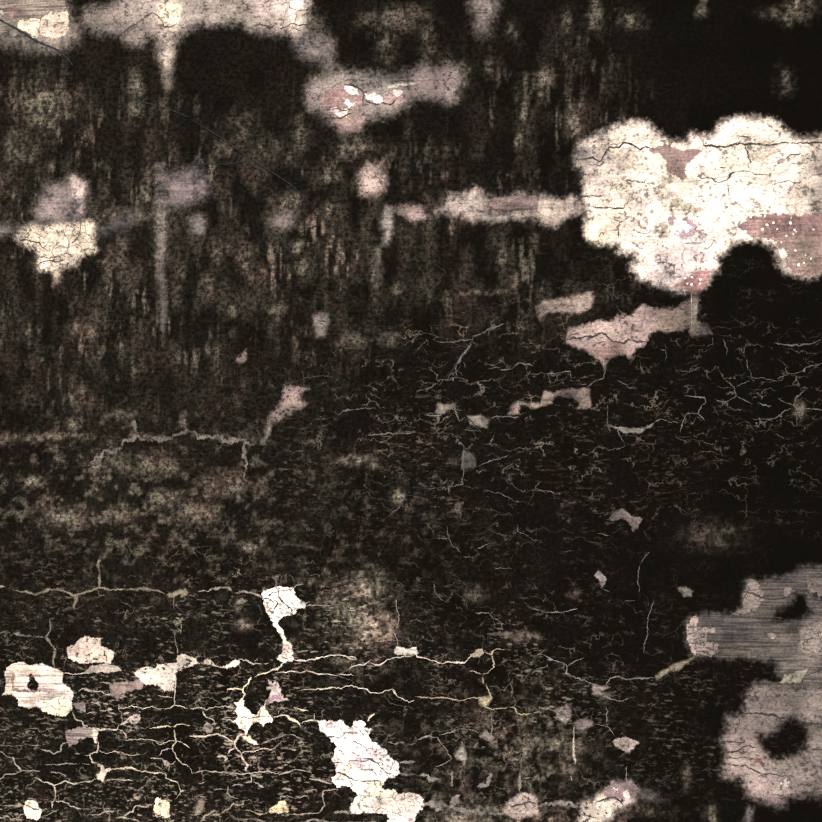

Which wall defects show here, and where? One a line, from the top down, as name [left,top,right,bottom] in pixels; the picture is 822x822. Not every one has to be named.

peeling [436,117,822,366]
crack [566,332,646,441]
crack [655,362,822,431]
crack [90,419,254,482]
peeling [2,662,86,717]
peeling [67,636,122,673]
crack [0,560,329,653]
peeling [109,654,240,701]
peeling [262,575,306,663]
crack [0,601,651,822]
peeling [318,720,425,822]
crack [722,712,822,798]